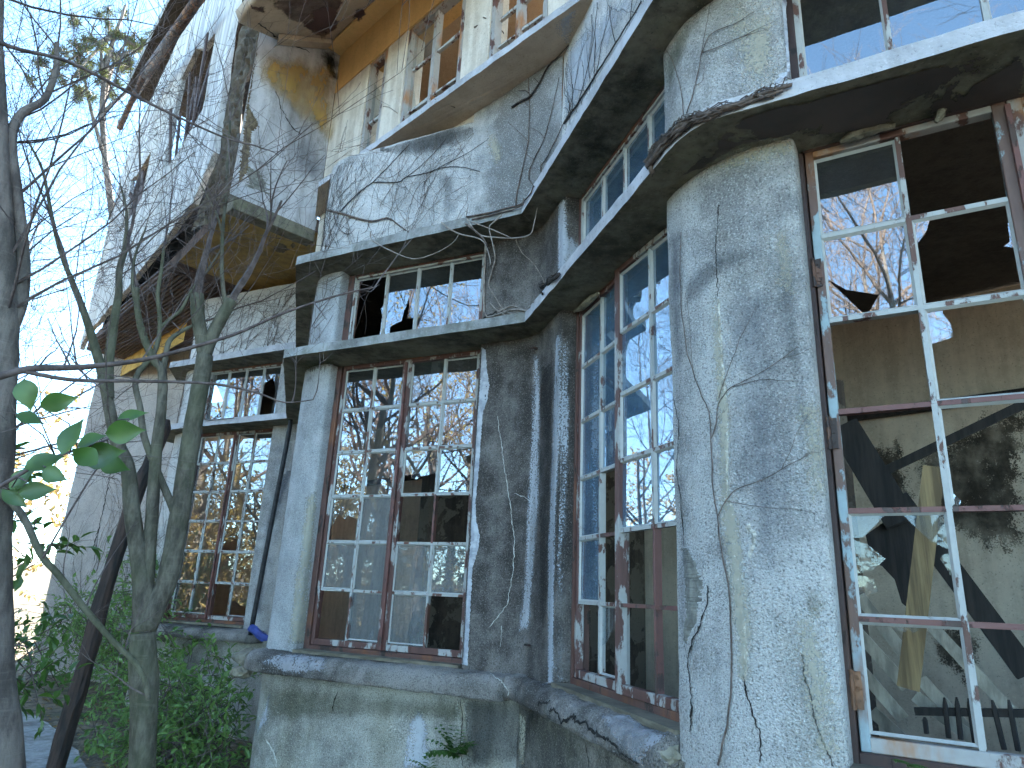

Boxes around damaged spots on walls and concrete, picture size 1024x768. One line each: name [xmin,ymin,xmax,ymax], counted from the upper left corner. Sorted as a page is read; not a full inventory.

damp [263,61,328,130]
damp [414,130,453,152]
damp [558,200,578,270]
crack [713,205,721,296]
damp [519,338,570,683]
crack [684,586,709,732]
crack [537,700,639,768]
crack [742,674,762,762]
crack [801,655,834,767]